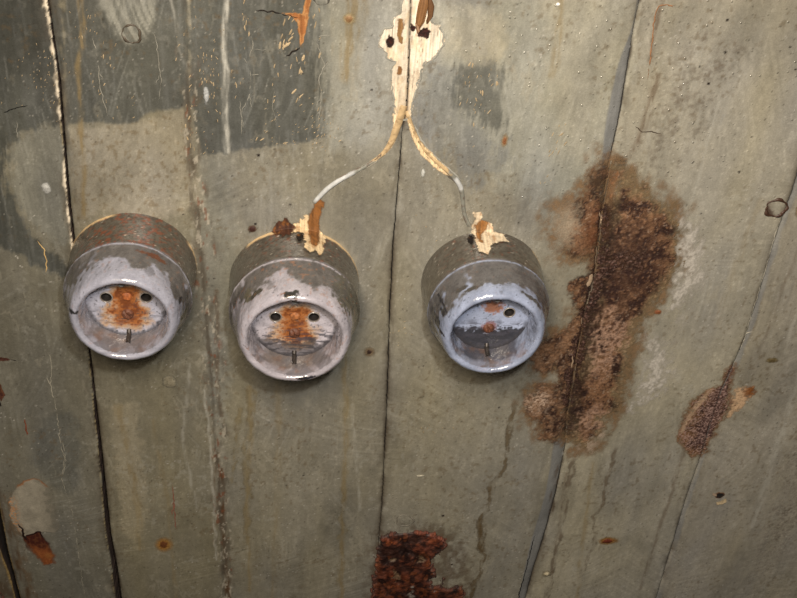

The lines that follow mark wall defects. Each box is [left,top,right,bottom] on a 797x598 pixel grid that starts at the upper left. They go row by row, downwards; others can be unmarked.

peeling [379,0,445,121]
peeling [9,478,58,565]